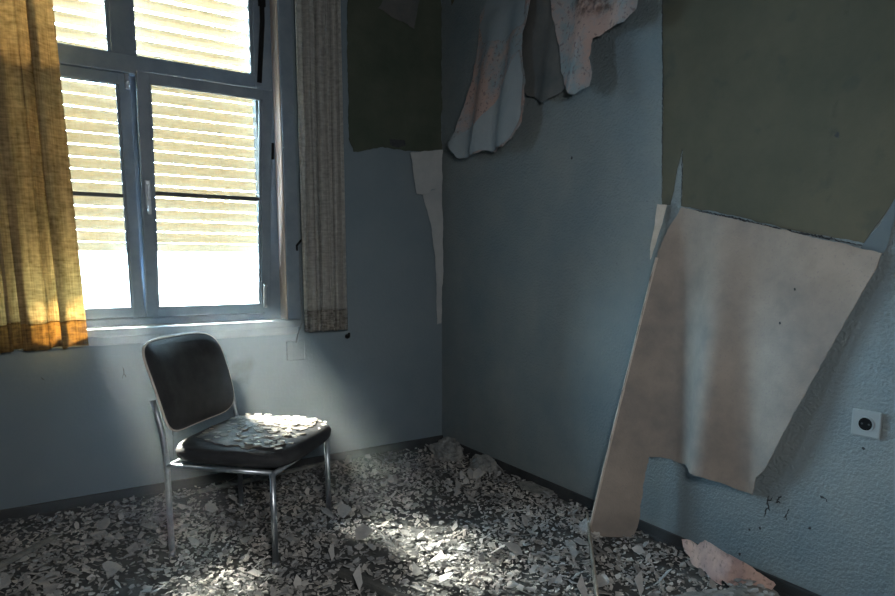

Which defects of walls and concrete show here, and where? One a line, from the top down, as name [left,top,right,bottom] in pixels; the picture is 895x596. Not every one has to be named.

peeling [447,0,566,158]